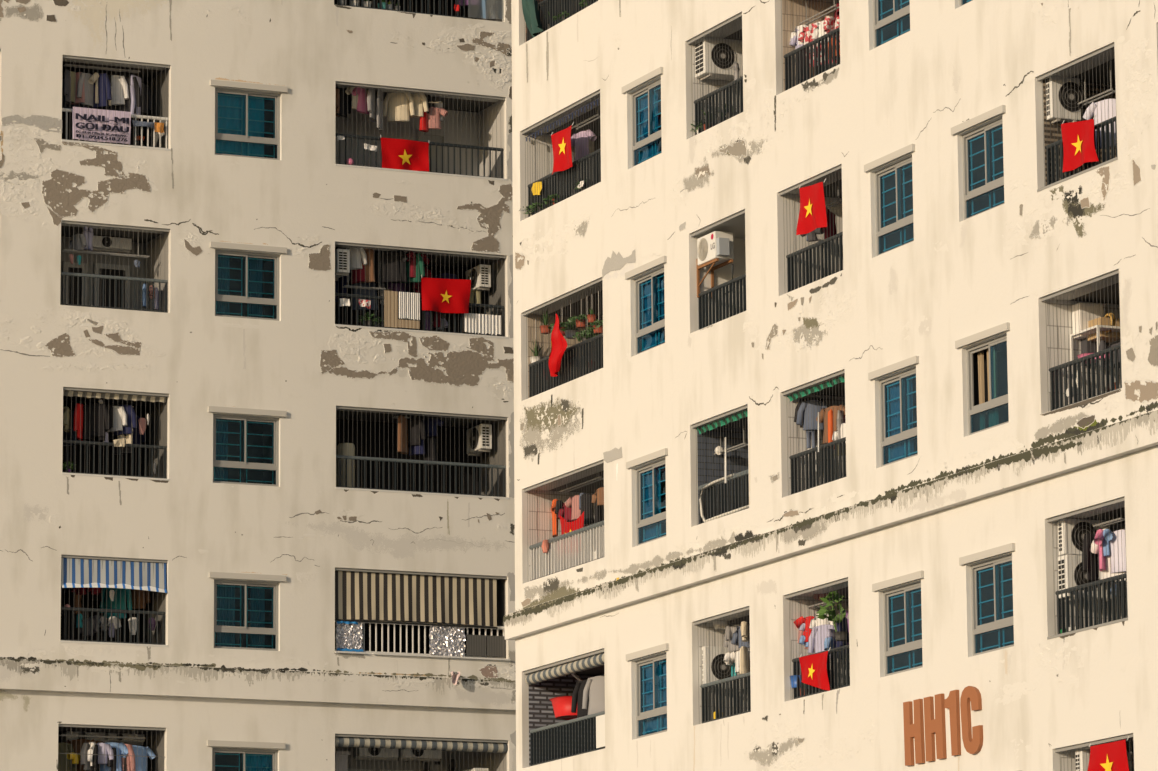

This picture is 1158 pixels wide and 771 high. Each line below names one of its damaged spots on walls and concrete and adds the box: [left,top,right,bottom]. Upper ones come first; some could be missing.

spalling [0,0,31,25]
peeling [390,0,512,99]
spalling [0,115,158,229]
crack [144,219,219,235]
crack [254,226,335,248]
peeling [1005,160,1156,250]
water stain [508,242,522,338]
water stain [793,317,828,348]
spalling [315,328,582,460]
crack [270,512,512,567]
water stain [504,391,1158,626]
water stain [0,647,365,711]